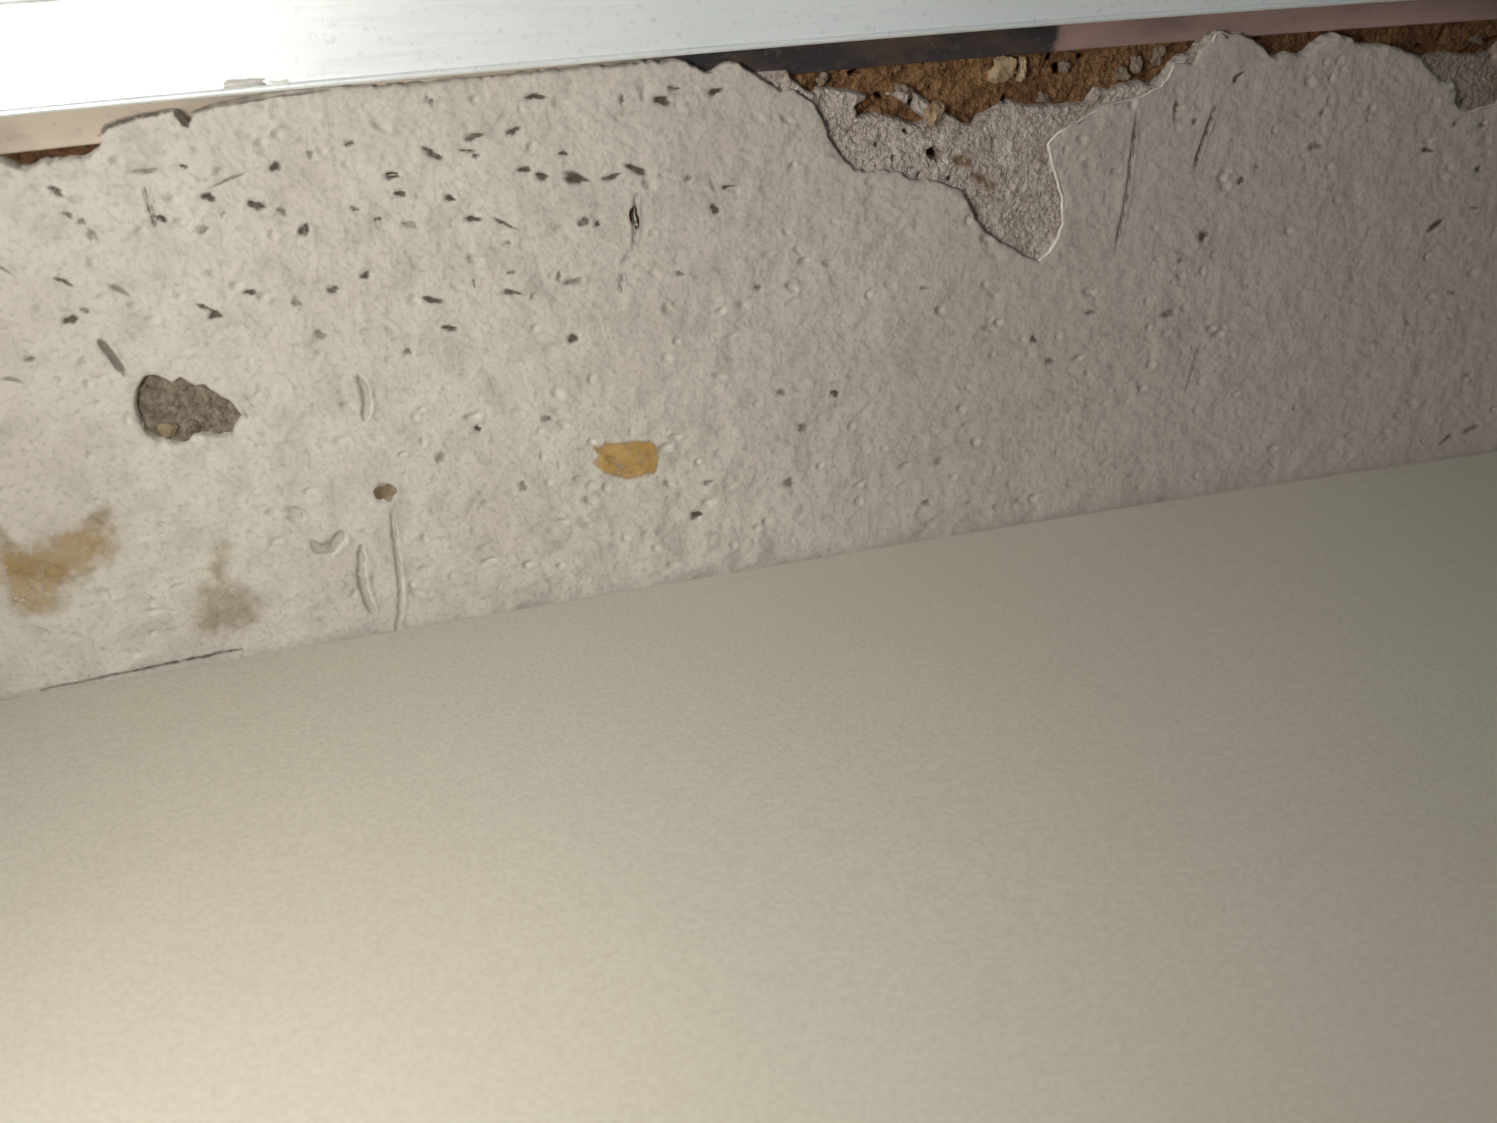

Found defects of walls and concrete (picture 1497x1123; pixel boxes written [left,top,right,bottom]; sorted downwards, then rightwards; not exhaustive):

flaking render [754,20,1497,261]
flaking render [137,375,241,441]
damp [5,533,105,611]